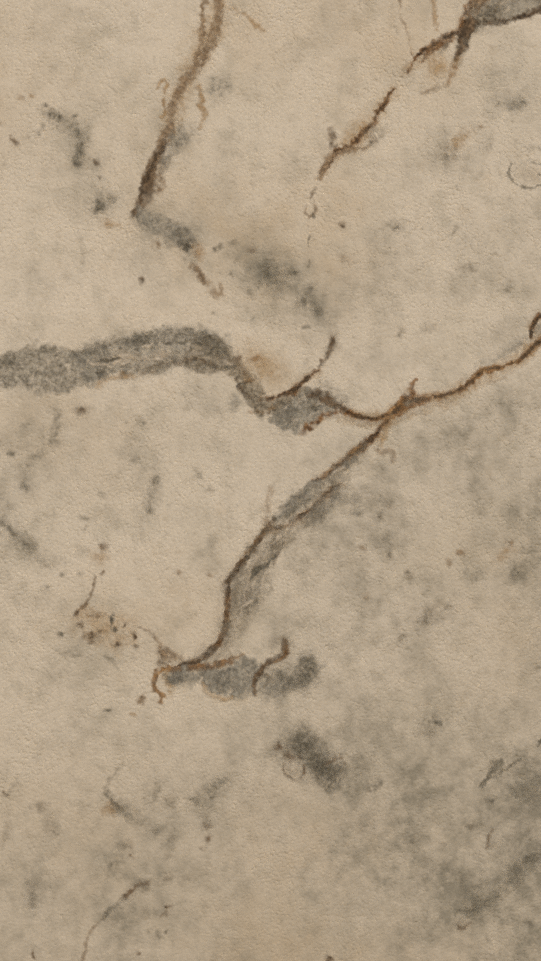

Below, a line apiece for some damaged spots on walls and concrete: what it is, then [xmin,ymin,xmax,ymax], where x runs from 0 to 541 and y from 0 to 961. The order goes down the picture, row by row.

crack [408,1,476,73]
crack [319,89,394,180]
crack [138,313,541,703]